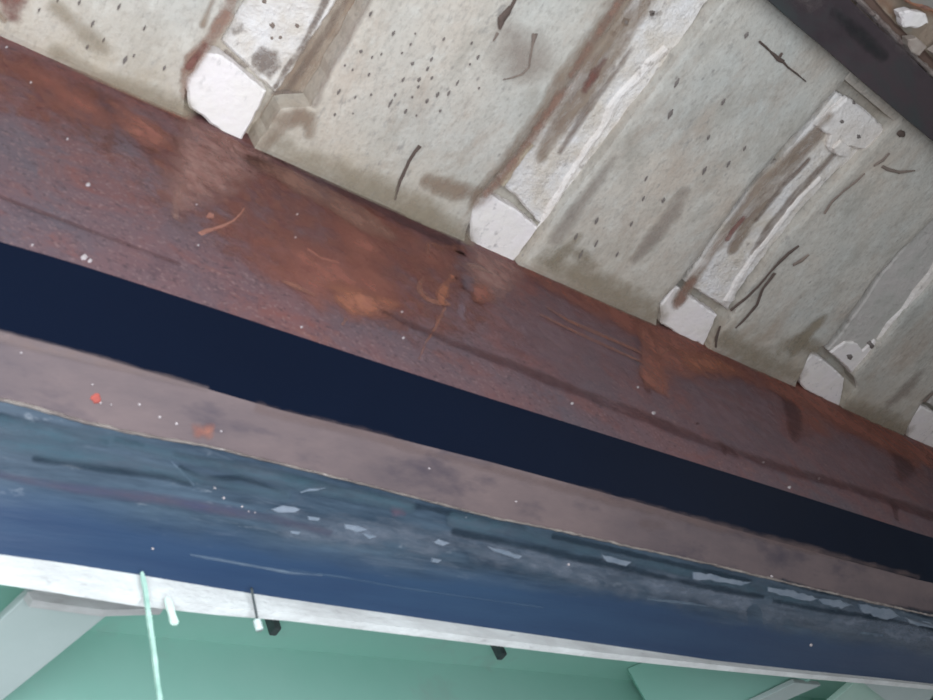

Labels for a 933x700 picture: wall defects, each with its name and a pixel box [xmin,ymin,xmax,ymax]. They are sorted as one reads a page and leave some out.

rust [182,0,236,90]
crack [493,0,517,41]
crack [394,145,421,200]
rust [473,0,648,205]
rust [708,114,834,258]
spalling [813,95,883,156]
crack [824,130,915,214]
spalling [723,176,822,302]
crack [715,245,809,348]
rust [0,332,121,367]
rust [526,268,933,466]
peeling [0,414,933,648]